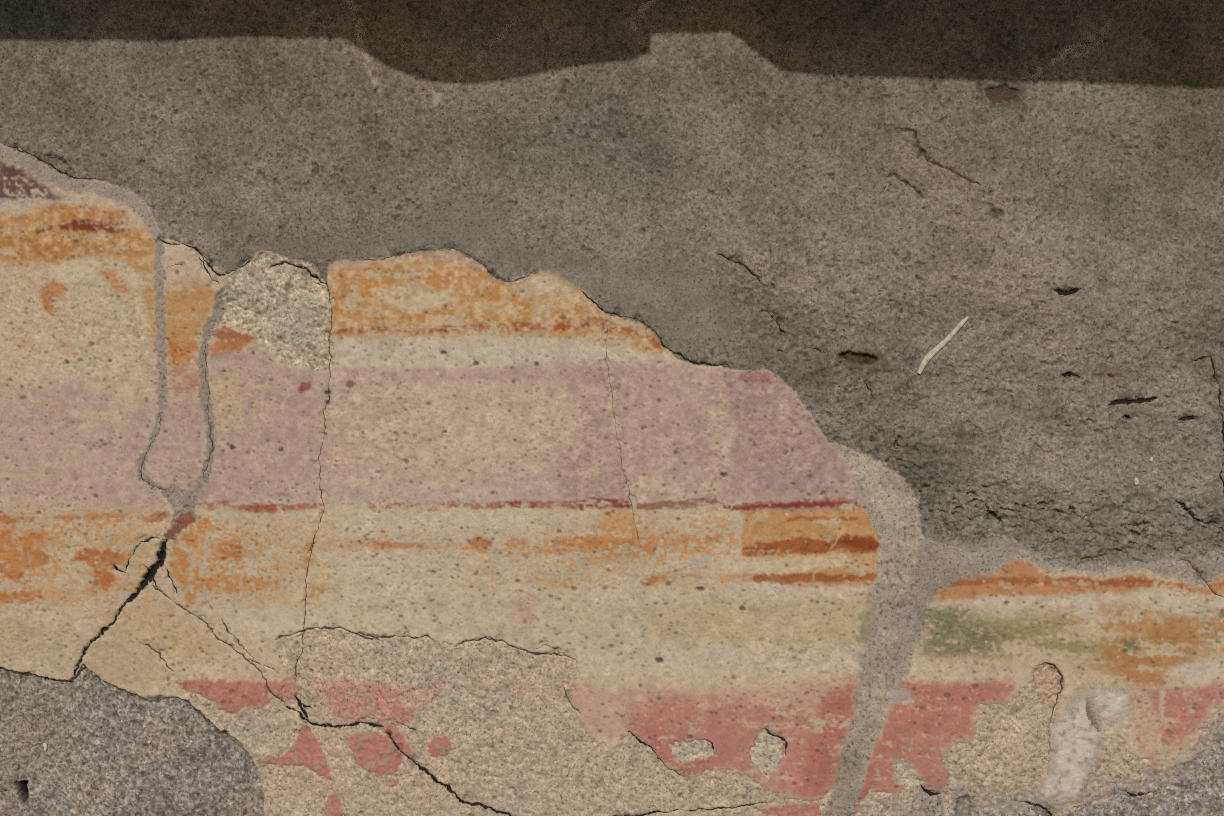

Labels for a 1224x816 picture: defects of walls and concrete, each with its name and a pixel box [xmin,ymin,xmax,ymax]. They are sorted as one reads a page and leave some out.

crack [880,129,996,214]
flaking render [222,252,335,372]
crack [581,290,728,542]
crack [1108,396,1158,418]
crack [1179,355,1224,492]
crack [44,238,581,816]
flaking render [864,421,1224,572]
crack [1176,500,1219,524]
crack [614,802,767,816]
crack [765,728,788,756]
flaking render [852,673,1065,816]
flaking render [1080,708,1224,807]